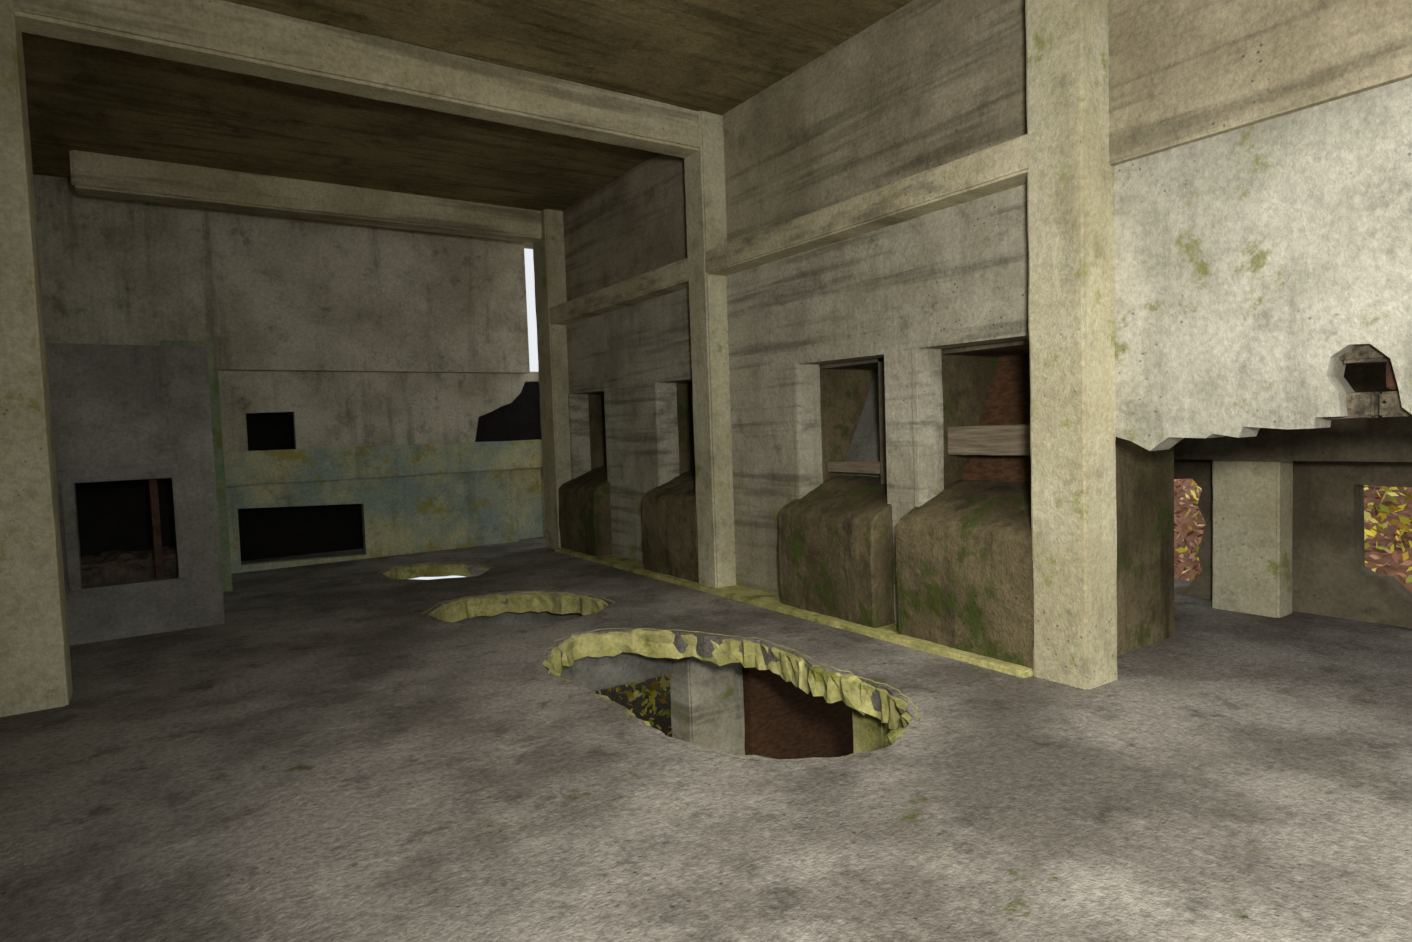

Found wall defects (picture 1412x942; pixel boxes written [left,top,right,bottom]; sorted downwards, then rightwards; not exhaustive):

spalling [378,562,495,580]
spalling [423,590,920,763]